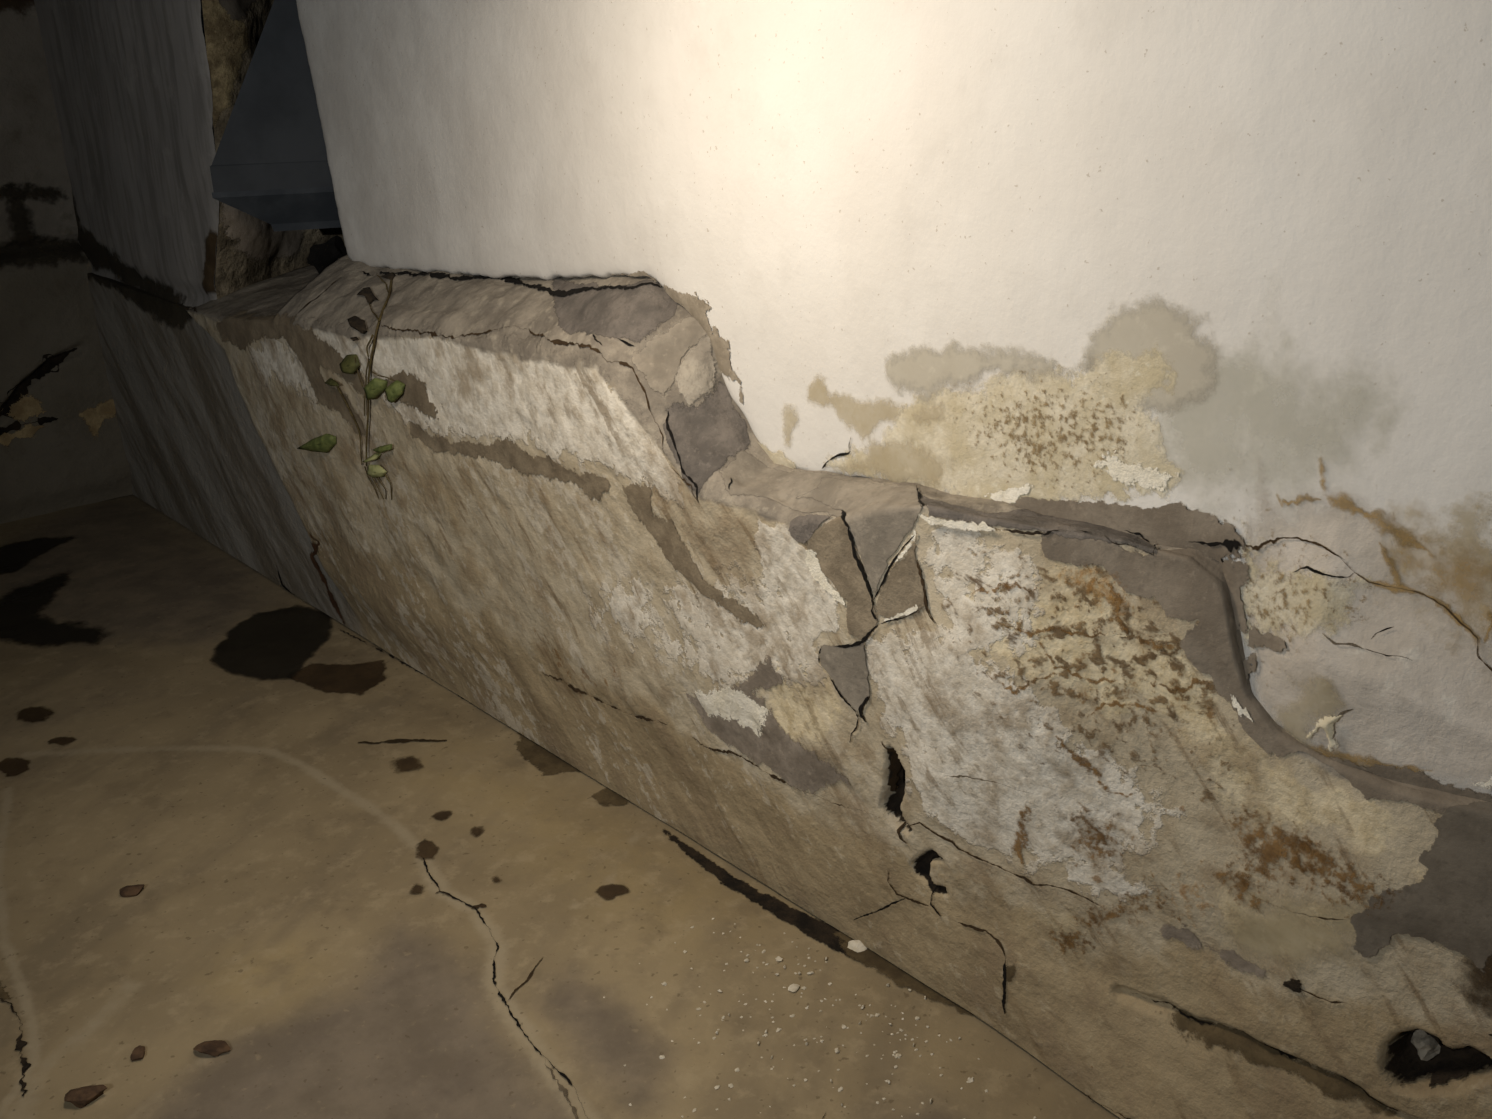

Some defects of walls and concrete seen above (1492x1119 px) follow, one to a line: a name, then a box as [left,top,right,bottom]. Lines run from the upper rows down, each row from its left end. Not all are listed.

damp [0,182,192,329]
peeling [216,307,766,629]
spalling [552,271,1002,711]
damp [808,299,1216,504]
damp [0,537,106,646]
damp [211,606,386,695]
peeling [686,655,850,794]
crack [542,485,1098,905]
crack [1194,537,1492,671]
crack [423,858,588,1119]
crack [663,829,1016,1016]
spalling [1384,1029,1492,1087]